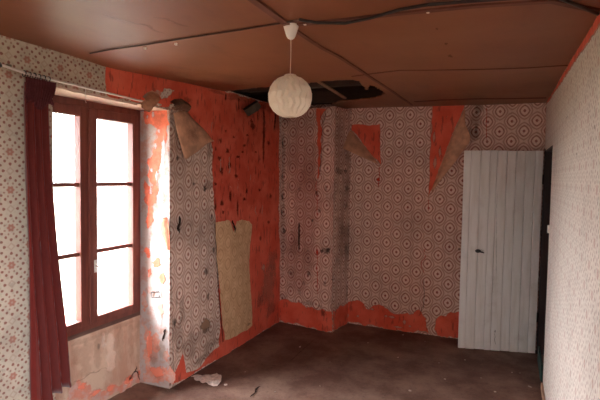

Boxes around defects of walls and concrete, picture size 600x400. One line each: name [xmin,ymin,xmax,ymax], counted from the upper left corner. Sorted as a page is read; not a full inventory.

peeling [143,110,170,229]
peeling [144,247,165,284]
peeling [67,323,176,400]